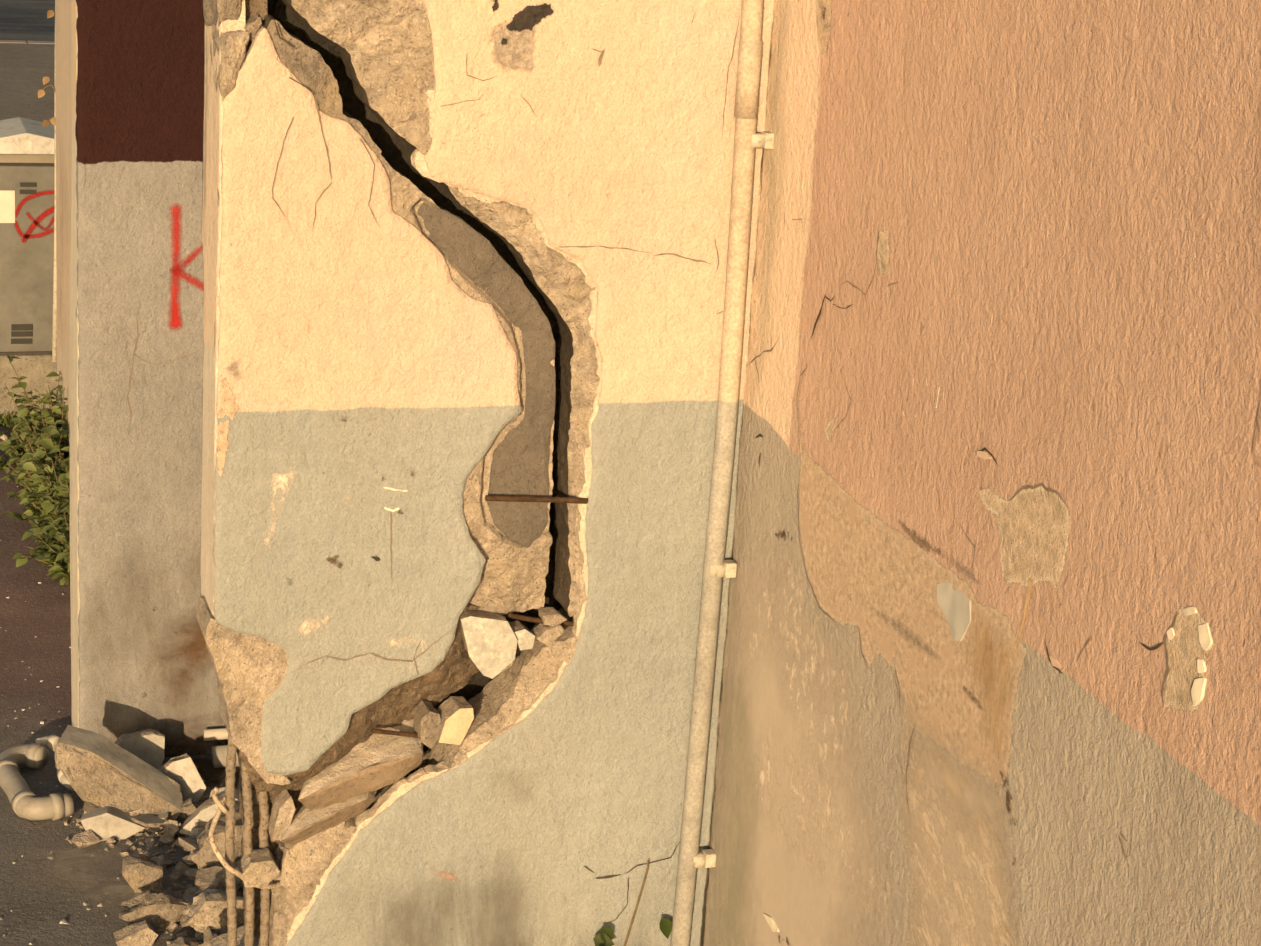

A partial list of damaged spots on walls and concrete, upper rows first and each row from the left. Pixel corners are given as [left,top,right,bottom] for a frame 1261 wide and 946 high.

crack [272,0,559,398]
crack [559,239,719,272]
crack [748,334,779,382]
crack [796,259,899,450]
spalling [196,0,600,946]
crack [387,511,395,578]
crack [506,431,562,630]
corrosion [178,630,206,678]
crack [291,623,458,674]
crack [434,670,496,710]
peeling [740,397,1071,946]
peeling [1140,606,1213,712]